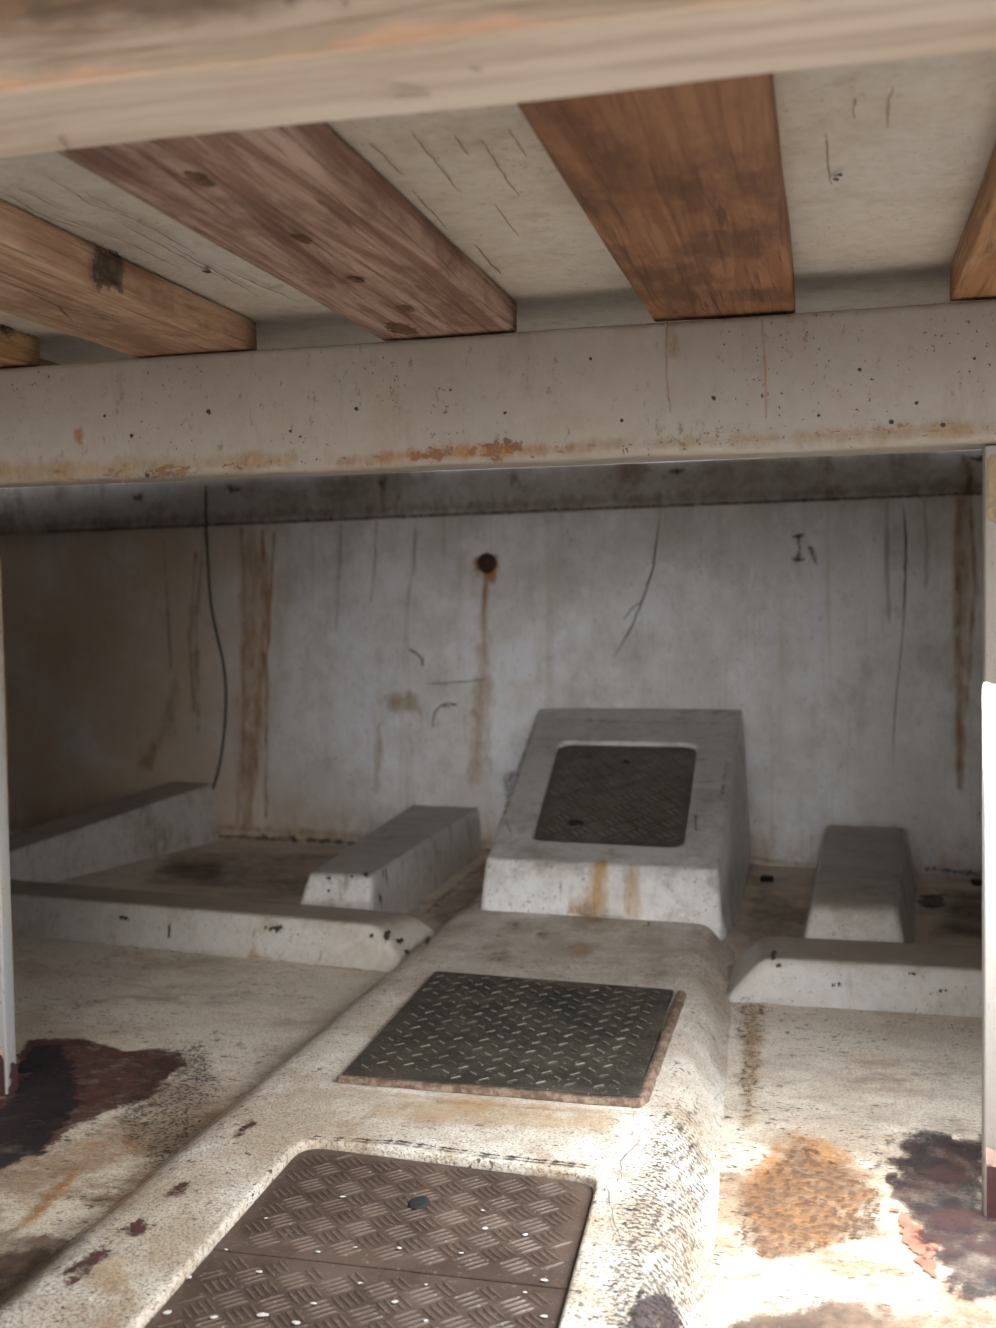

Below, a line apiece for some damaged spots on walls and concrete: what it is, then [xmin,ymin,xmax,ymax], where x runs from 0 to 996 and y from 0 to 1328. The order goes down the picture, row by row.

crack [613,509,661,659]
leakage [0,1228,85,1307]
peeling [64,1218,158,1285]
peeling [0,1036,231,1173]
peeling [166,1179,197,1196]
peeling [313,1135,597,1167]
spalling [572,1091,738,1328]
rust [726,1136,883,1267]
leakage [730,1297,924,1328]
peeling [874,1128,996,1305]